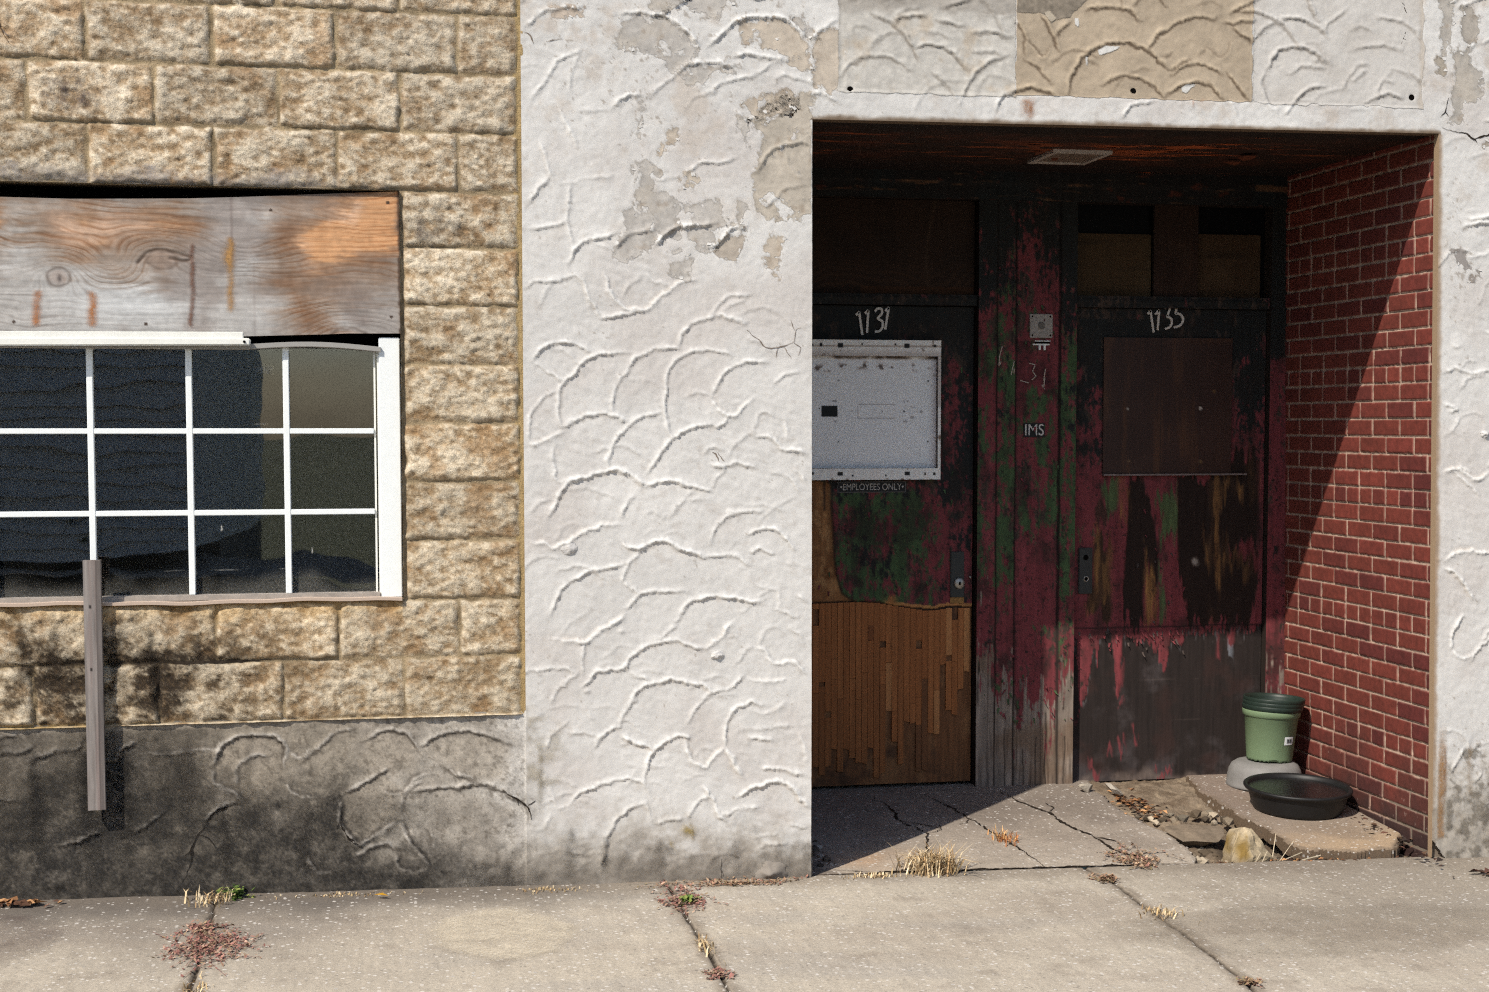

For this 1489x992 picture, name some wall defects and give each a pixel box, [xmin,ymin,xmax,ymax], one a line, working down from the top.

peeling [612,0,850,283]
peeling [1434,0,1485,124]
crack [1442,98,1489,142]
water stain [0,618,450,900]
crack [829,792,1169,872]